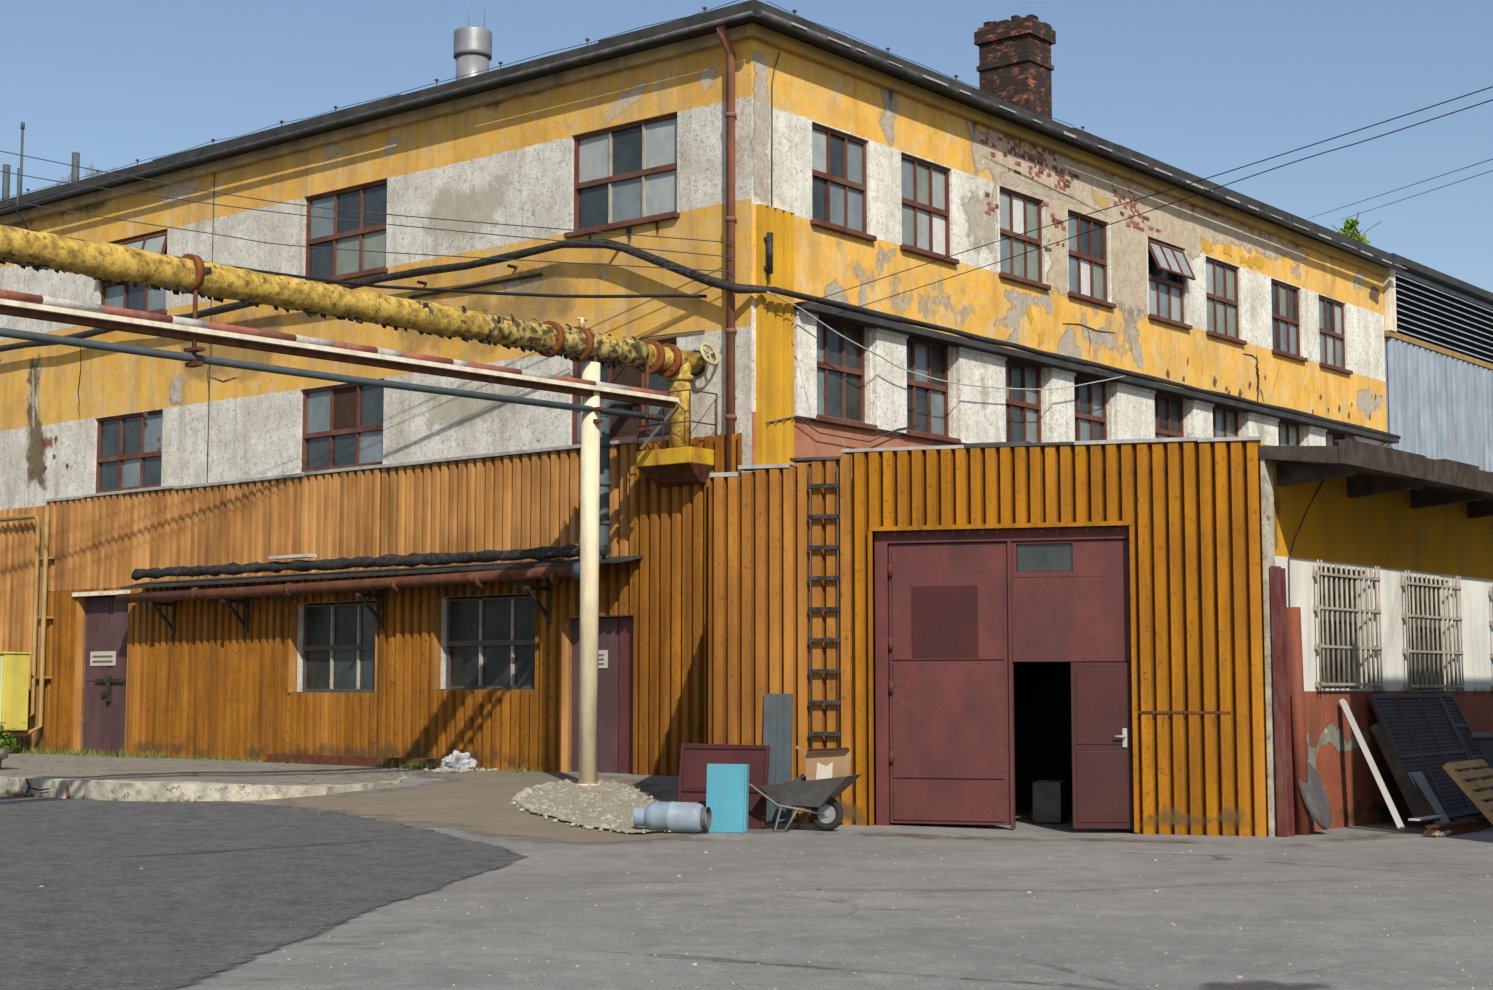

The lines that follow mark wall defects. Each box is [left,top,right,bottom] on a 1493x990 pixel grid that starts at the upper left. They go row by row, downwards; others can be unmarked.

peeling [879,88,896,145]
peeling [824,244,973,324]
spalling [962,120,1309,368]
crack [1243,353,1264,402]
water stain [26,359,47,490]
spalling [1306,722,1371,771]